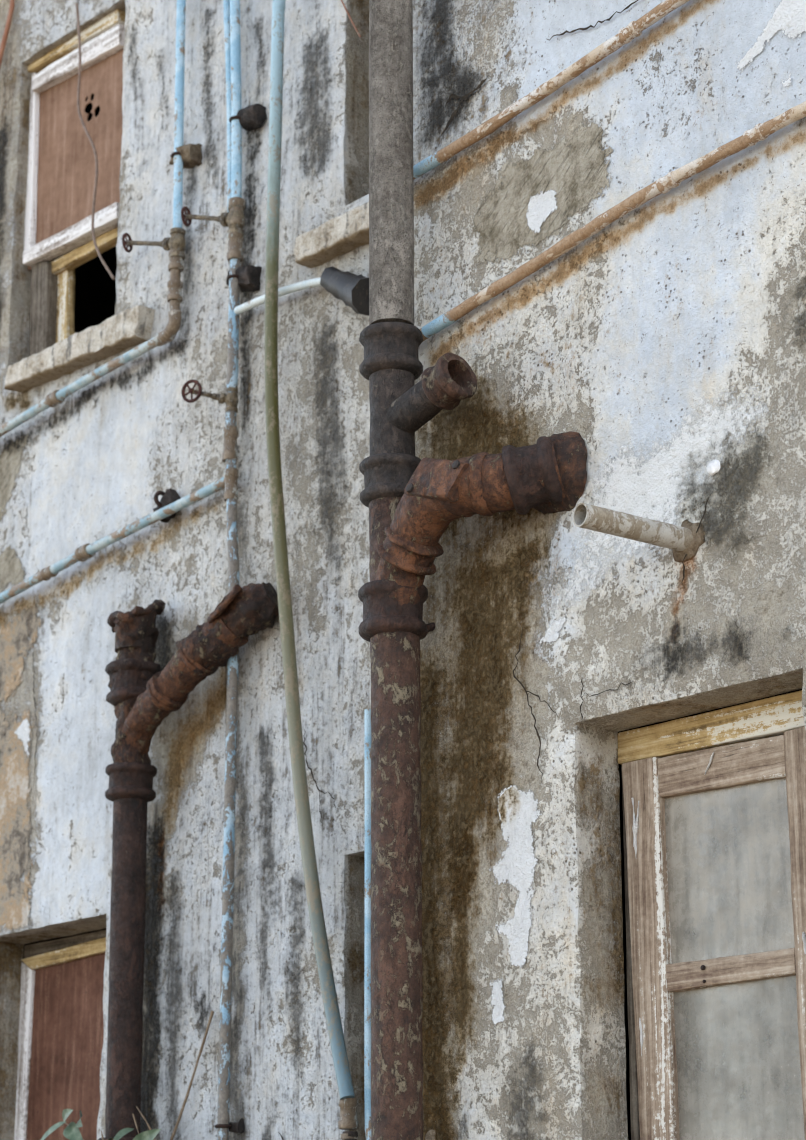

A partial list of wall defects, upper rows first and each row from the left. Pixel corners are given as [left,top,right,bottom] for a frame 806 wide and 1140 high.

water stain [422,0,479,141]
crack [547,0,638,41]
peeling [735,0,806,71]
spalling [471,121,613,264]
water stain [664,623,698,673]
water stain [421,549,547,1140]
peeling [489,785,542,968]
peeling [490,979,506,1025]